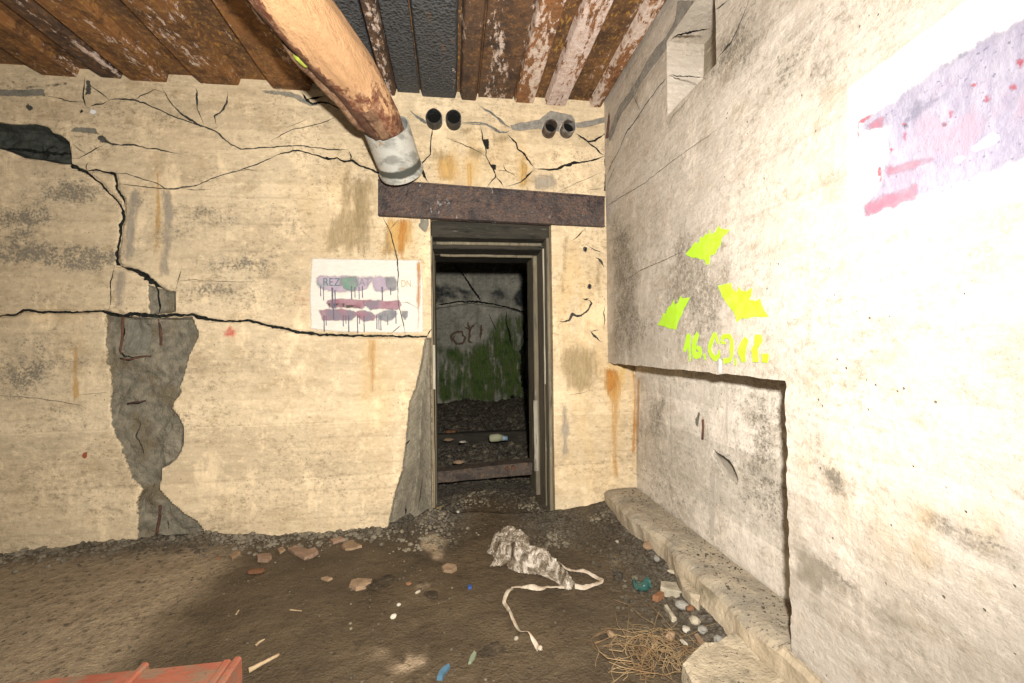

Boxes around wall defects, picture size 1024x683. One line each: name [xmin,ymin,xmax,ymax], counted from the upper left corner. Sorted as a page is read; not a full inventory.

crack [411,0,749,203]
spalling [0,123,107,165]
crack [0,79,528,399]
crack [560,298,605,341]
spalling [106,285,203,539]
damp [564,351,593,389]
rust [606,370,619,443]
spalling [714,451,738,484]